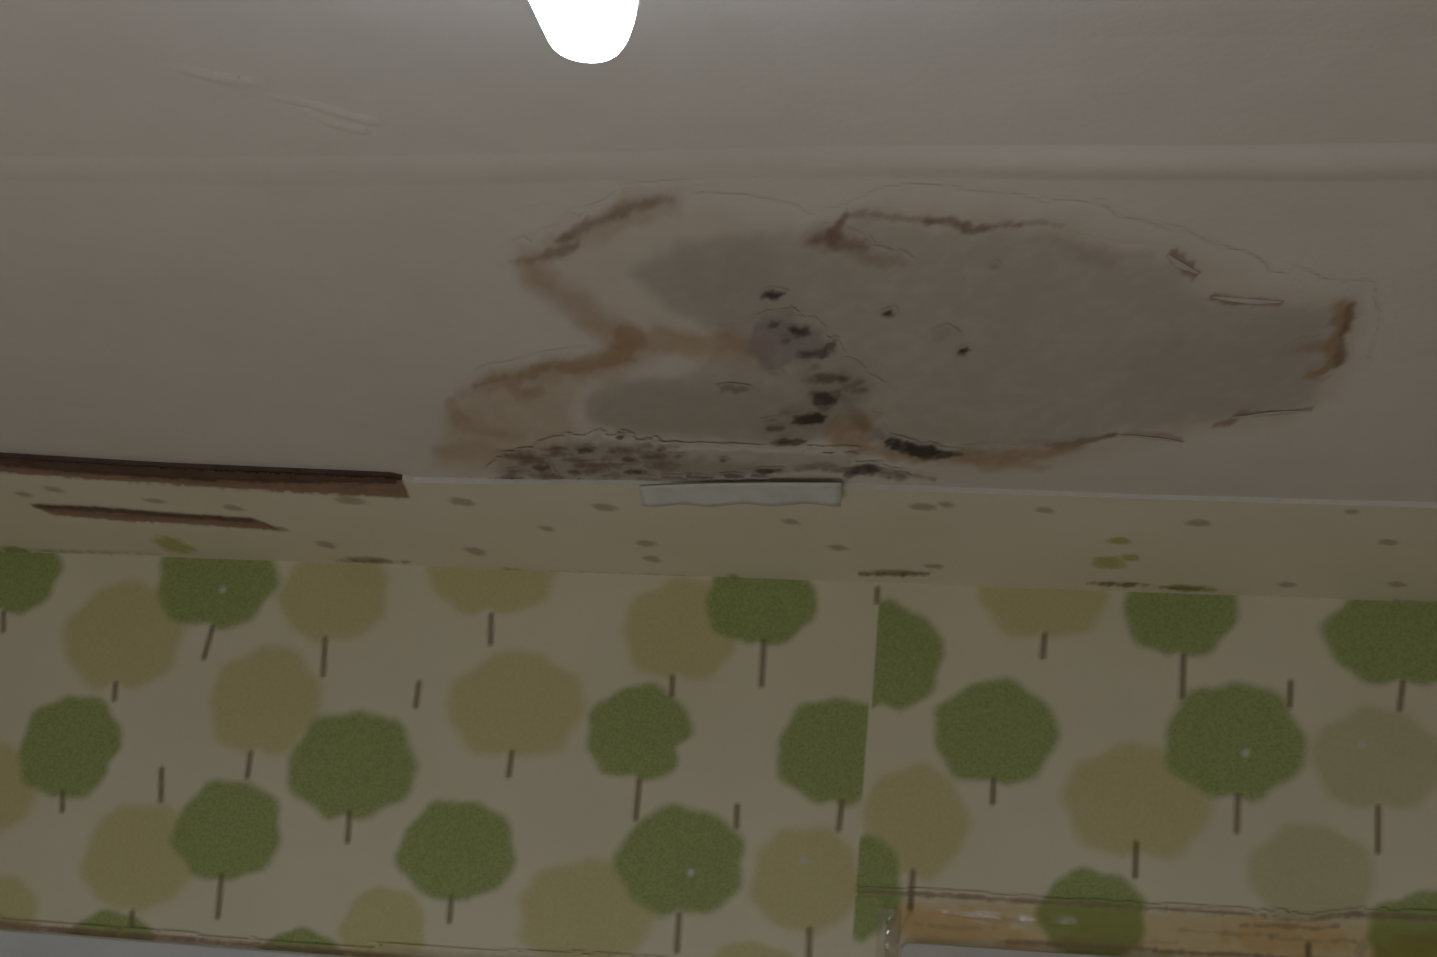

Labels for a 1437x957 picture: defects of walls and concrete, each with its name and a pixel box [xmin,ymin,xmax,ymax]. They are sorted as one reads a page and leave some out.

water stain [419,179,1384,485]